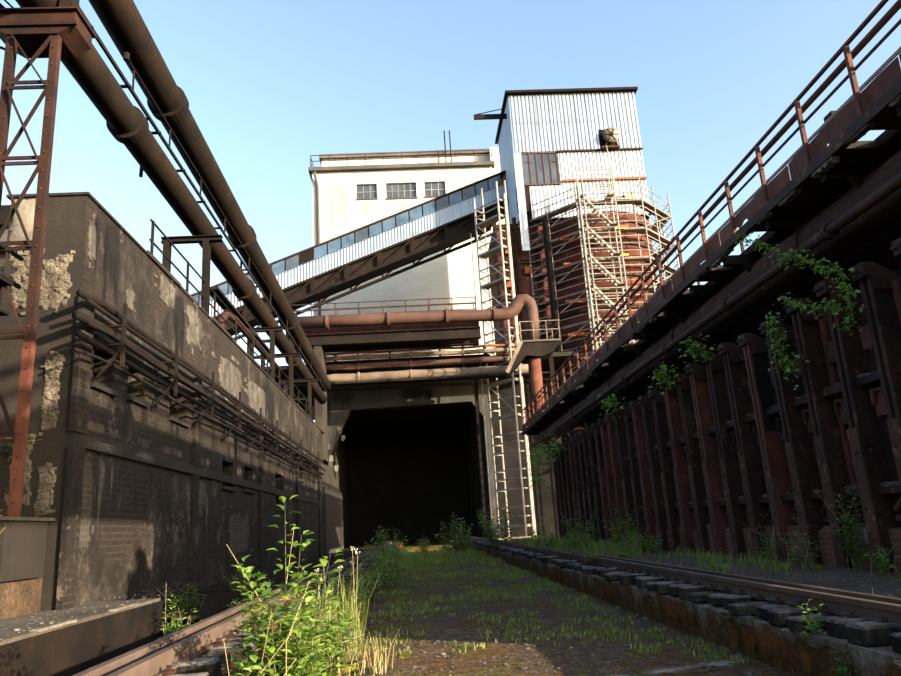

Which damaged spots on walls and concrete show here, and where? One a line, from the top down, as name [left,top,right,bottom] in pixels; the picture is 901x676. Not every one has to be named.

spalling [9,252,31,315]
spalling [39,250,75,314]
spalling [22,351,65,521]